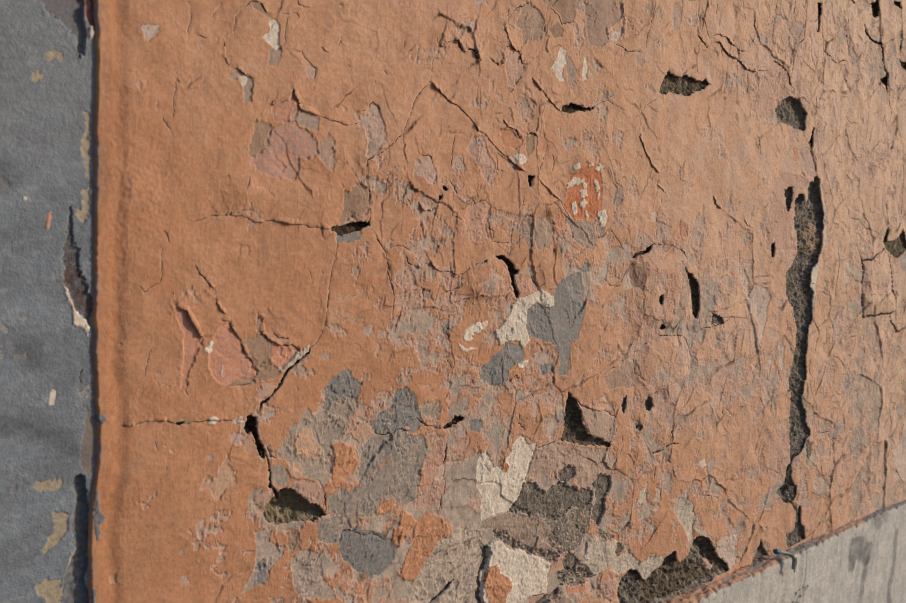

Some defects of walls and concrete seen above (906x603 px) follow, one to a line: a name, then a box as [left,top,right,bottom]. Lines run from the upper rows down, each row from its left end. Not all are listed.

crack [682,0,796,99]
crack [811,1,901,117]
flaking render [61,112,93,337]
crack [123,175,339,470]
peeling [171,265,300,394]
crack [343,37,570,329]
flaking render [738,127,827,548]
crack [809,204,906,438]
flaking render [883,229,906,258]
flaking render [11,384,97,603]
crack [261,447,280,502]
peeling [409,399,768,603]